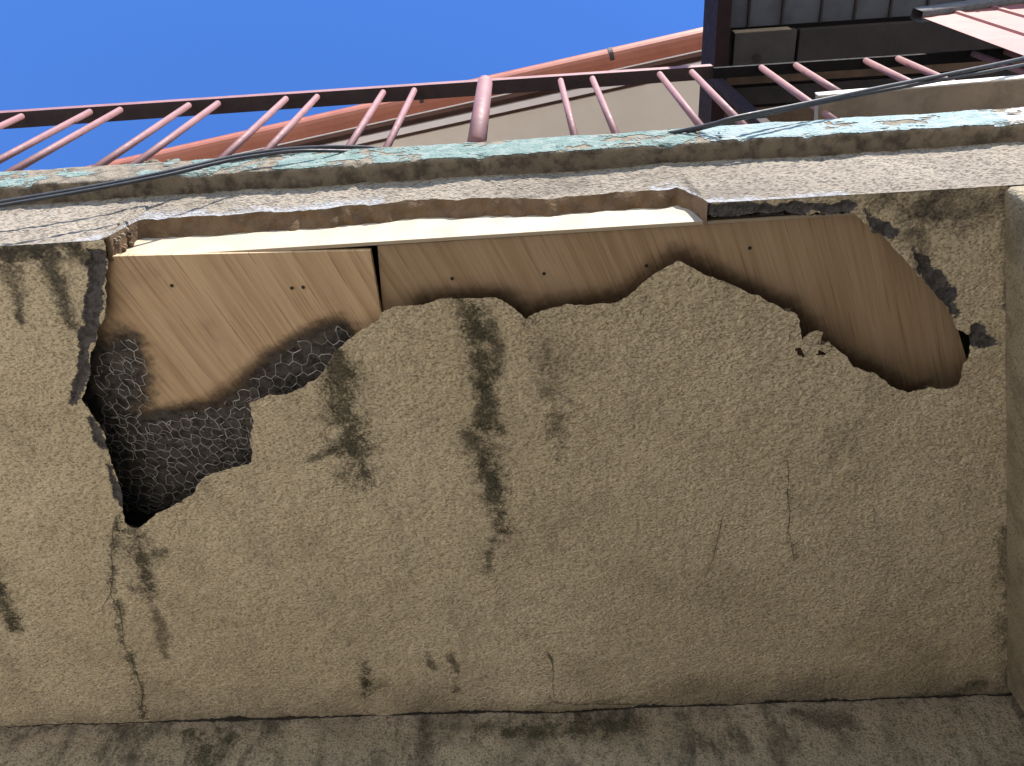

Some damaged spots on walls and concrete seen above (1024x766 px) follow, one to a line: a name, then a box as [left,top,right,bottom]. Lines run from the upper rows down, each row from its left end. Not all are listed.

peeling [0,167,100,188]
peeling [124,107,1024,177]
leakage [0,242,94,329]
leakage [309,348,375,490]
spalling [68,183,899,529]
leakage [417,252,925,569]
flaking render [900,245,961,329]
crack [0,517,1013,728]